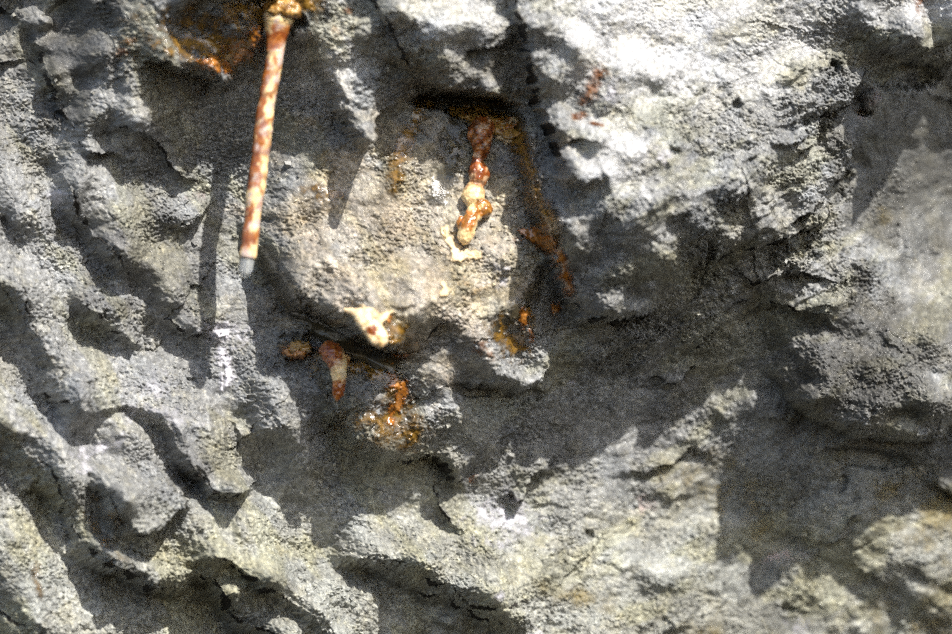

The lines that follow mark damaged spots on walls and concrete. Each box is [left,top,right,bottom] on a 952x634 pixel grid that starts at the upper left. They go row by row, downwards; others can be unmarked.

corrosion [148,0,265,82]
corrosion [510,139,574,316]
corrosion [353,314,423,450]
corrosion [473,307,535,357]